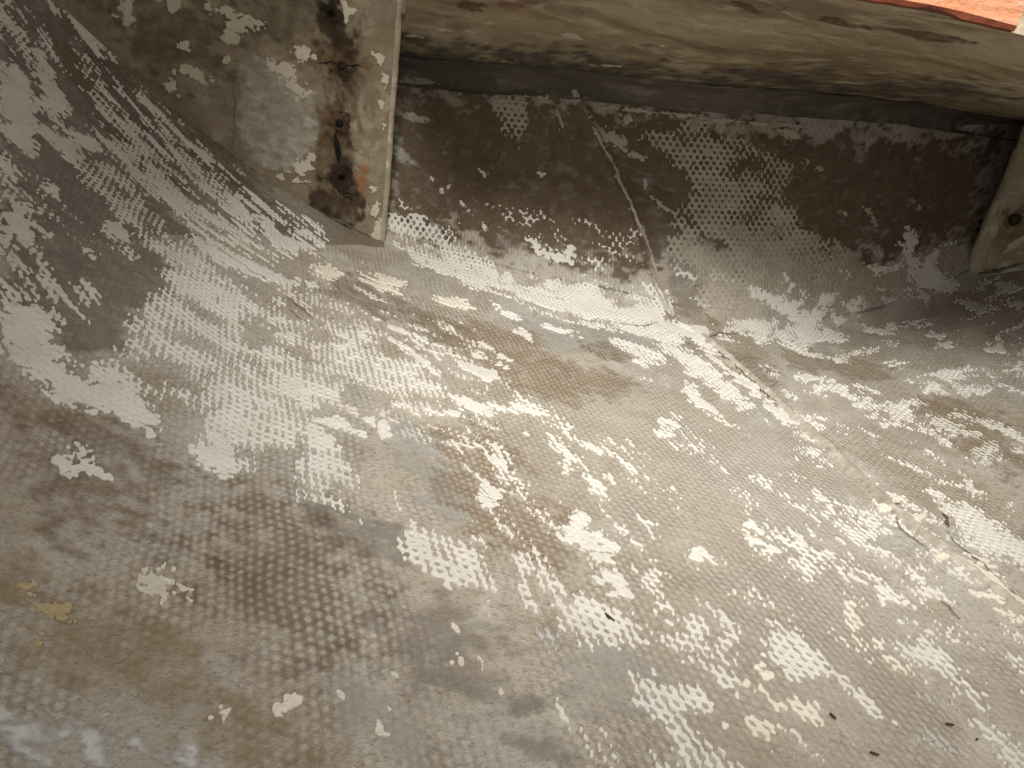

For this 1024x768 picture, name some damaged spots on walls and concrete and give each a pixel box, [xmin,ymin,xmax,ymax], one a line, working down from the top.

corrosion [309,1,368,94]
corrosion [310,105,367,229]
water stain [388,68,1005,281]
peeling [0,0,616,525]
crack [679,332,777,403]
peeling [793,335,1024,466]
peeling [393,490,498,593]
peeling [511,510,830,742]
peeling [627,667,745,768]
peeling [742,487,1024,669]
peeling [842,600,1024,767]
crack [948,531,1023,599]